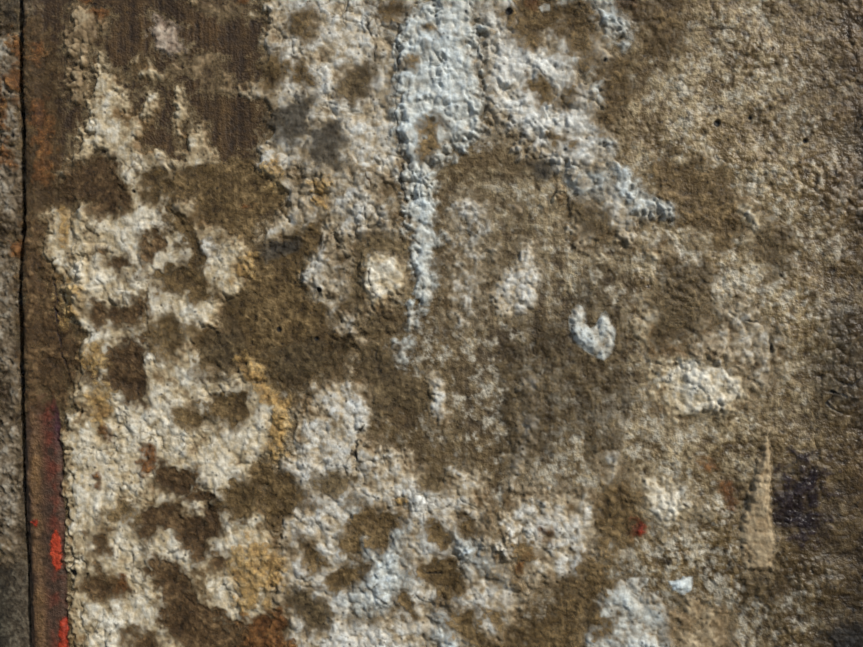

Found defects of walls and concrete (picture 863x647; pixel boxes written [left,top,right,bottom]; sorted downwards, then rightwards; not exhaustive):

crack [17,0,25,45]
crack [366,16,400,147]
water stain [399,55,418,70]
crack [20,79,28,214]
water stain [451,0,795,271]
water stain [415,118,548,336]
water stain [392,336,416,364]
water stain [403,302,425,332]
peeling [569,305,617,360]
crack [18,359,26,401]
peeling [669,575,692,594]
peeling [58,617,69,647]